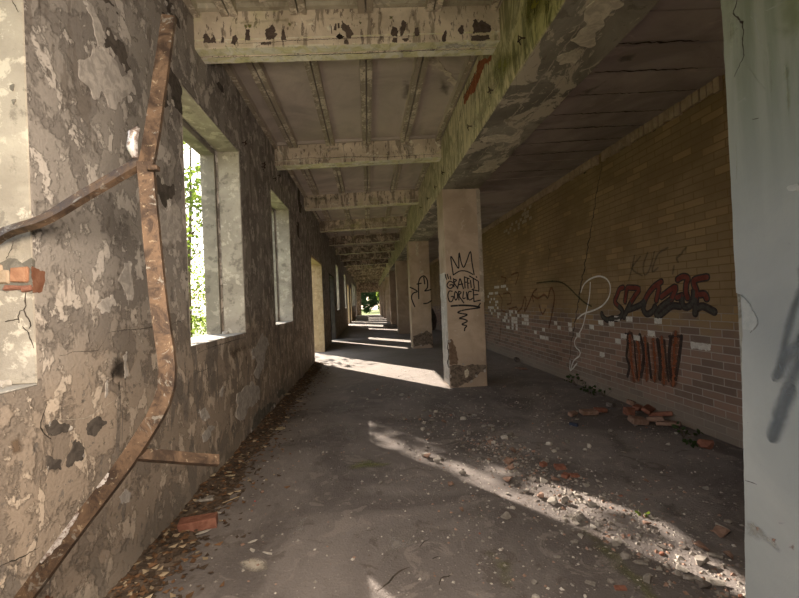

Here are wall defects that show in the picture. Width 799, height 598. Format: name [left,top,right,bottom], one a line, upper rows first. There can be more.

water stain [442,19,491,48]
crack [733,1,744,77]
crack [5,292,34,348]
spalling [447,339,486,388]
flaking render [45,419,85,470]
flaking render [86,416,107,437]